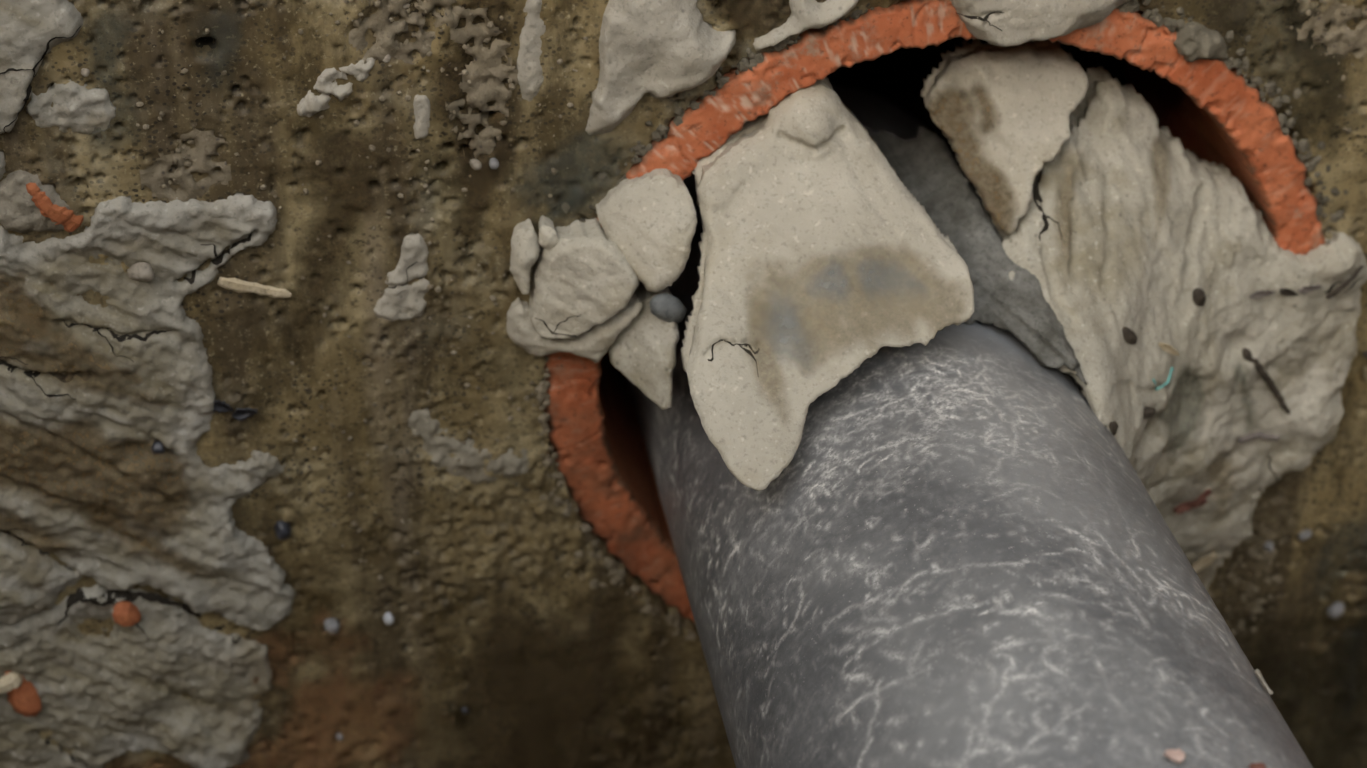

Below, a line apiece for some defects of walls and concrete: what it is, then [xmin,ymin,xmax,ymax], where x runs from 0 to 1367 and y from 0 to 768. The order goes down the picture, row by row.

spalling [1295,2,1367,60]
crack [1033,175,1062,241]
crack [176,229,256,284]
crack [708,339,760,377]
crack [0,529,241,644]